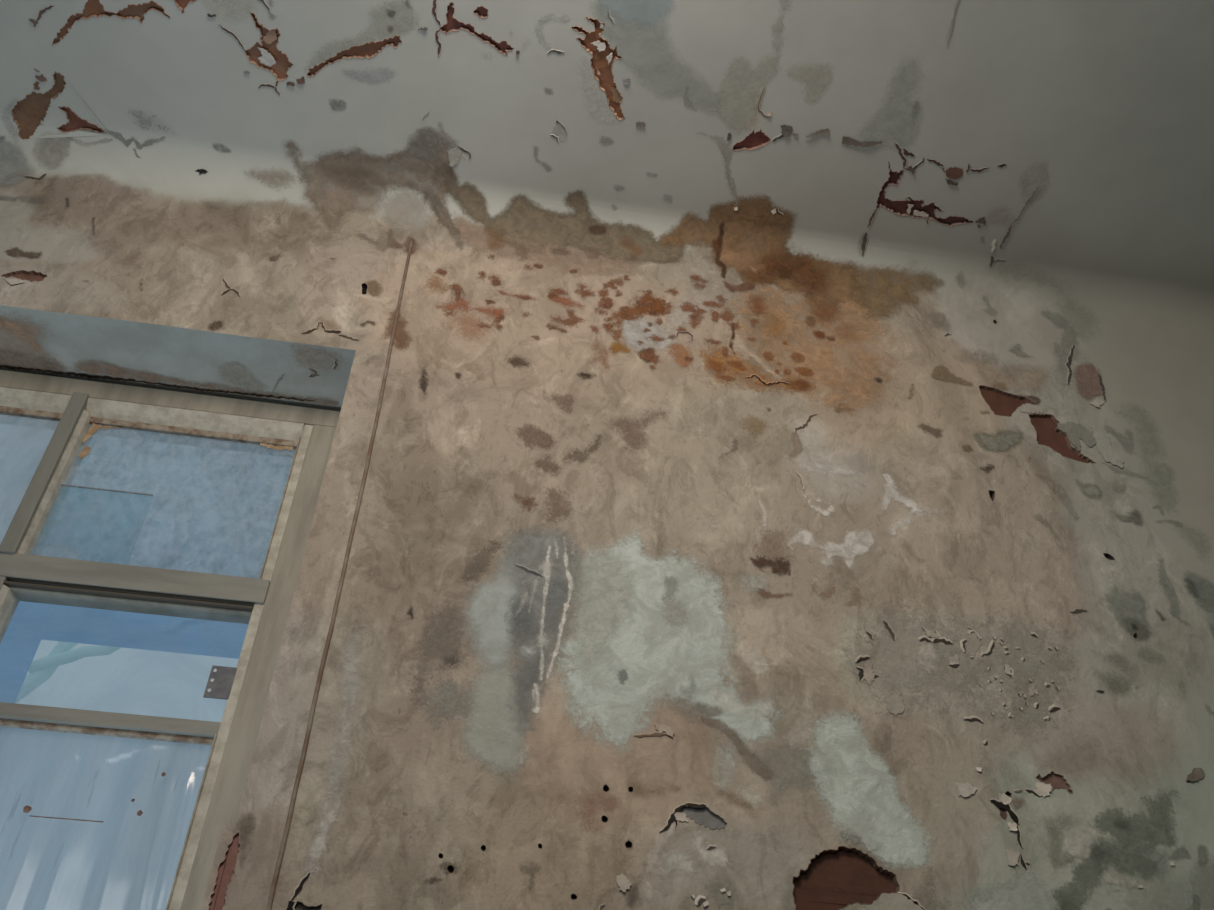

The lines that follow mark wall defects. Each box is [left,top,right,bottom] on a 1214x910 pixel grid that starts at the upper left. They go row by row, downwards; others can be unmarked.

water stain [0,137,70,199]
spalling [6,68,165,157]
spalling [207,11,402,96]
spalling [418,0,519,56]
water stain [599,0,776,131]
water stain [5,247,42,259]
rust [430,255,531,334]
rust [532,196,942,413]
water stain [463,425,601,728]
peeling [557,530,780,746]
peeling [792,712,932,910]
water stain [1047,791,1214,910]